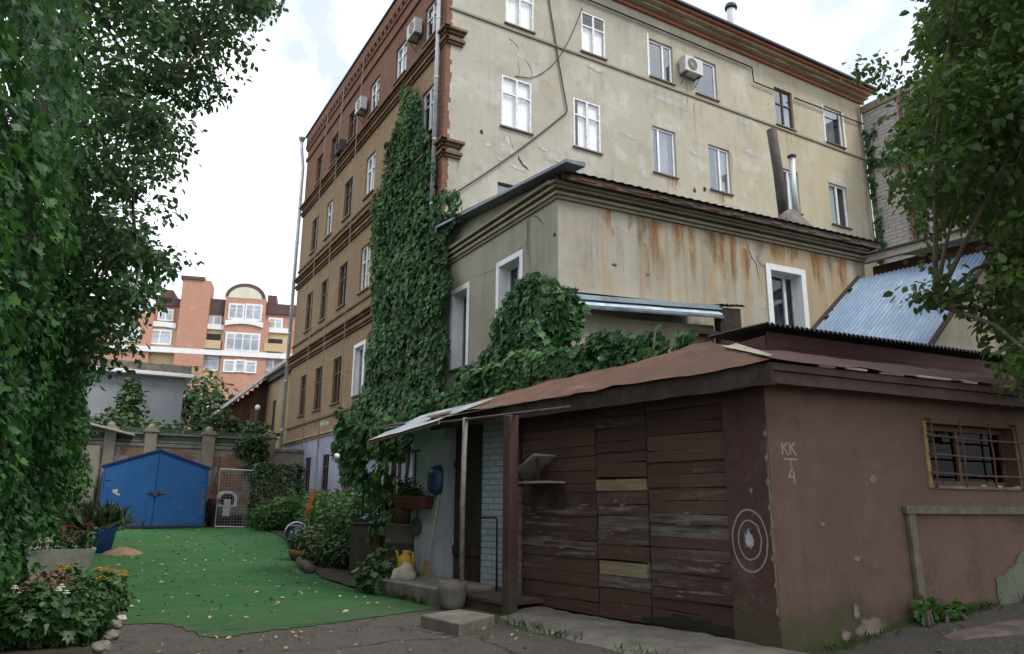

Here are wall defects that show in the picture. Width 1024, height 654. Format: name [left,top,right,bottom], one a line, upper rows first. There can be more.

peeling [485,135,526,172]
spalling [842,604,885,640]